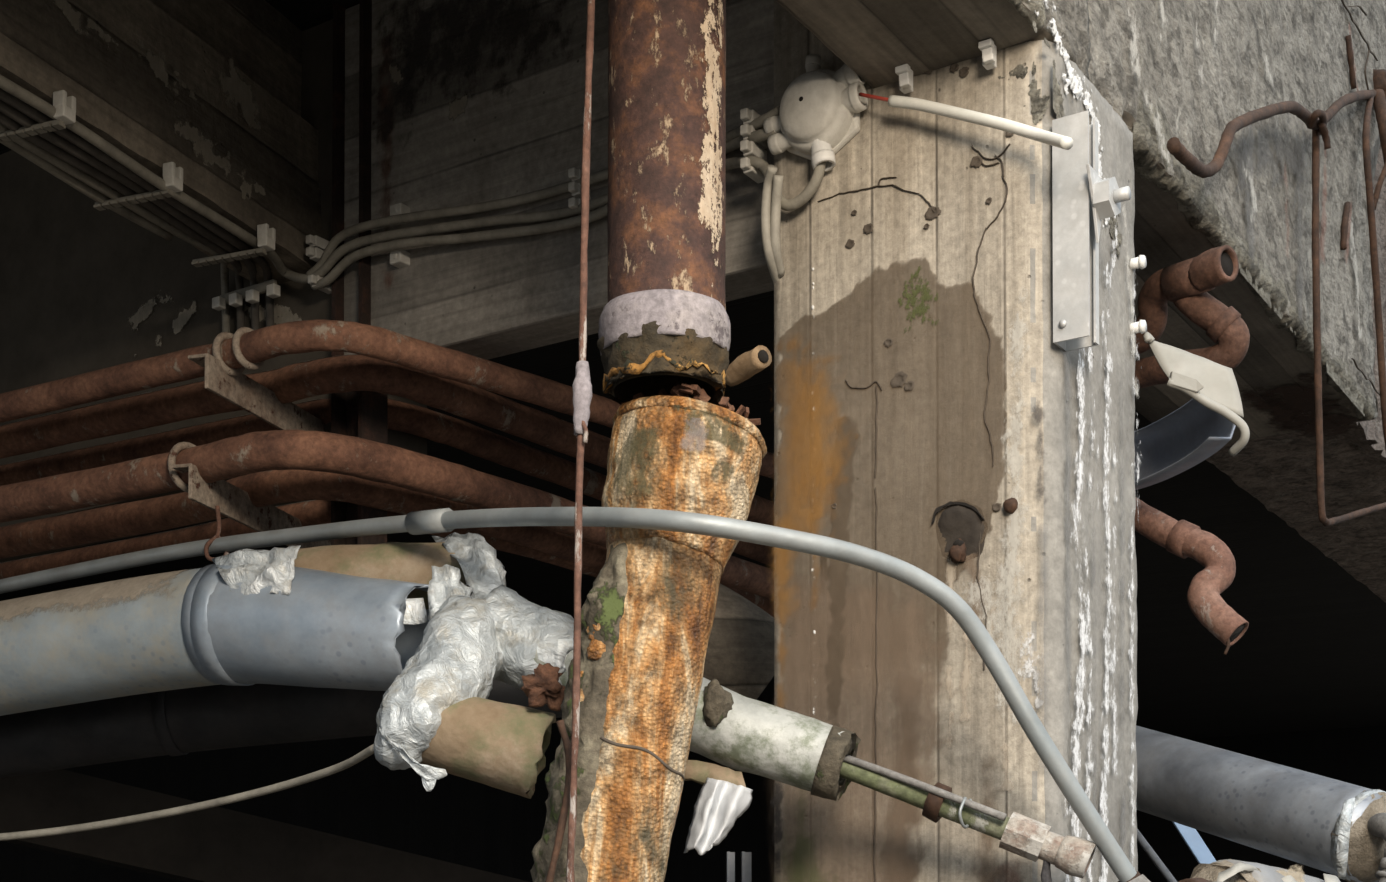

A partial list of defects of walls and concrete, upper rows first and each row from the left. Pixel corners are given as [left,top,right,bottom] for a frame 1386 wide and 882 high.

efflorescence [1029,0,1105,179]
damp [1145,95,1169,163]
damp [1103,213,1128,287]
spalling [1132,92,1376,421]
corrosion [1321,175,1351,258]
corrosion [1242,373,1364,440]
damp [775,258,1047,720]
damp [1071,312,1139,863]
damp [775,548,975,783]
damp [771,781,922,882]
efflorescence [1065,806,1090,840]
efflorescence [1066,857,1108,882]